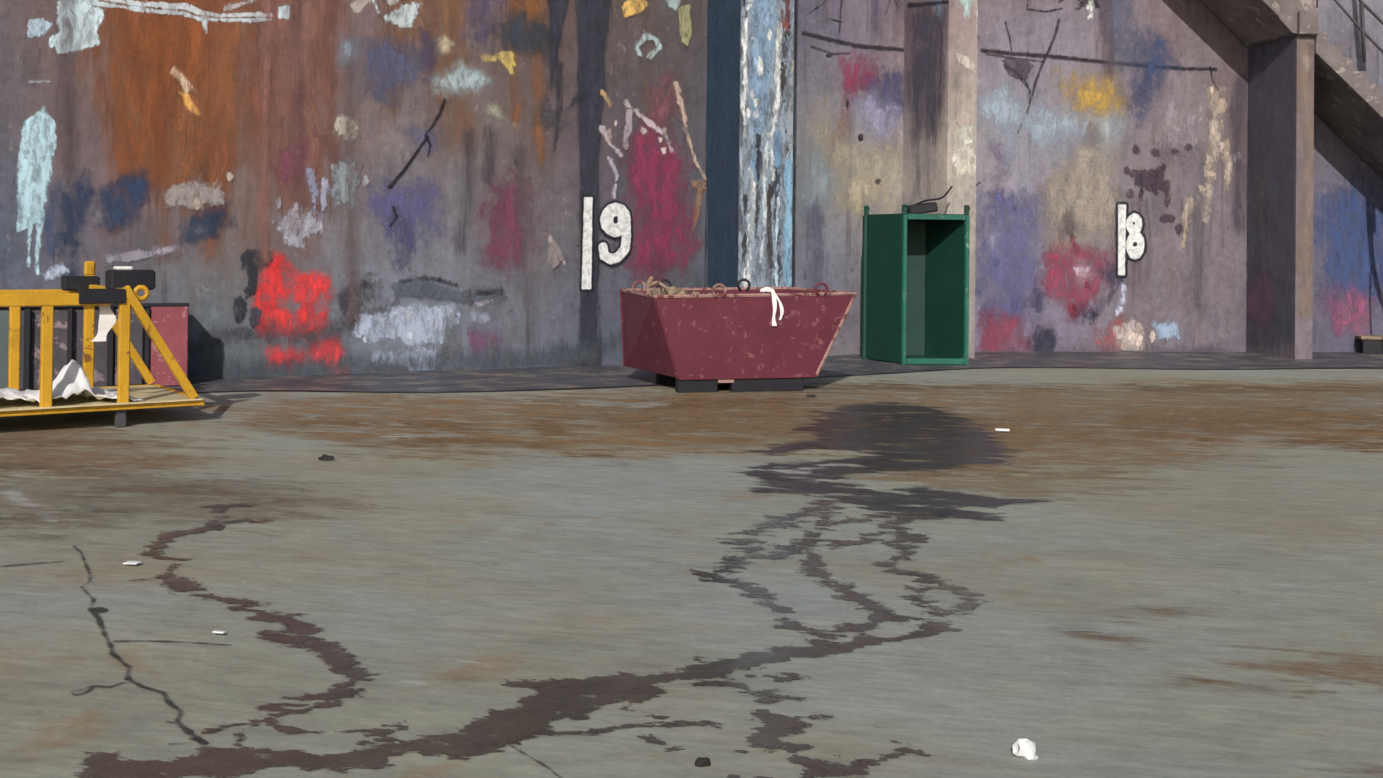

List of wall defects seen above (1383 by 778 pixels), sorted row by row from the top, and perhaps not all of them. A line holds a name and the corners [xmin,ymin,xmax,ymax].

corrosion [85,0,338,223]
corrosion [387,0,473,153]
peeling [738,0,794,287]
crack [1,546,228,745]
leakage [73,402,1050,778]